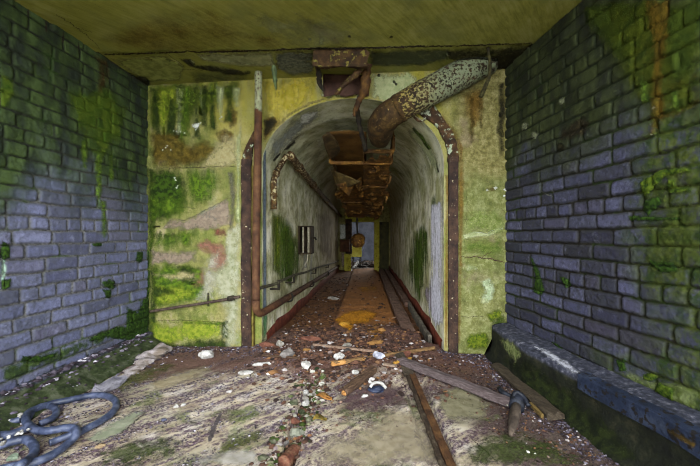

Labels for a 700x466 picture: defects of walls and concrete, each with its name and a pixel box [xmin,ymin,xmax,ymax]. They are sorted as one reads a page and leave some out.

crack [45,17,532,86]
rust [647,0,684,135]
water stain [151,81,240,167]